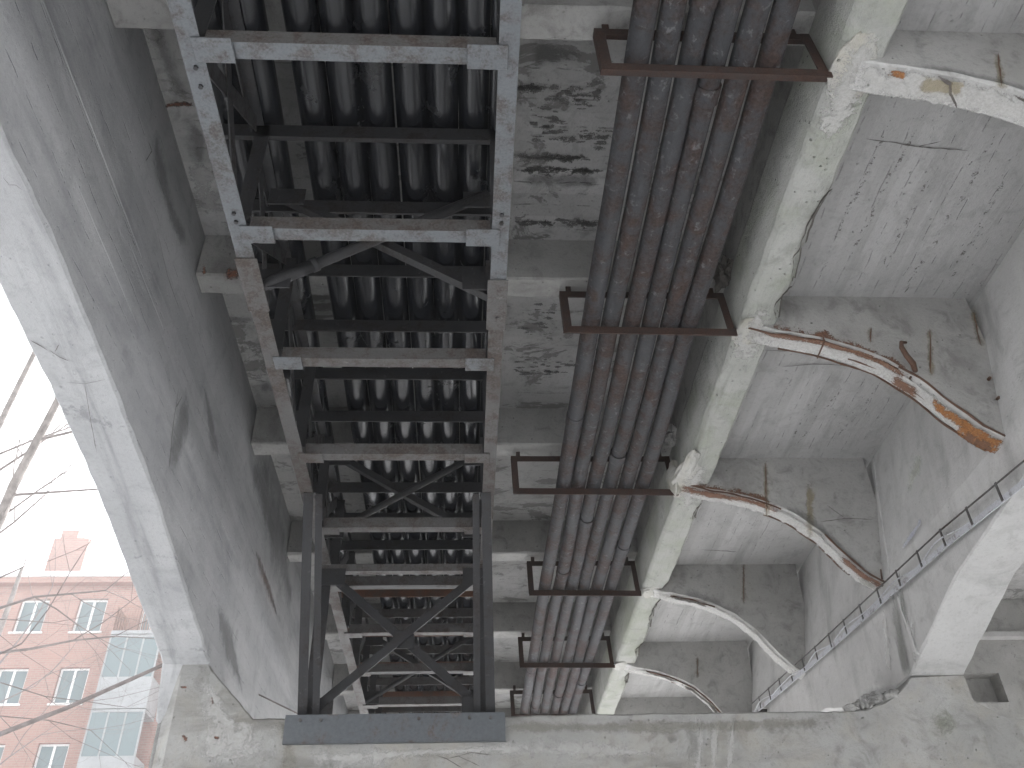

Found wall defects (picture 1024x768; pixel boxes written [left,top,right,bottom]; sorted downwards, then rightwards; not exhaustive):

spalling [849,54,1024,126]
crack [839,115,1003,293]
spalling [746,189,1006,454]
spalling [682,465,884,587]
spalling [625,659,721,713]
spalling [648,582,795,672]